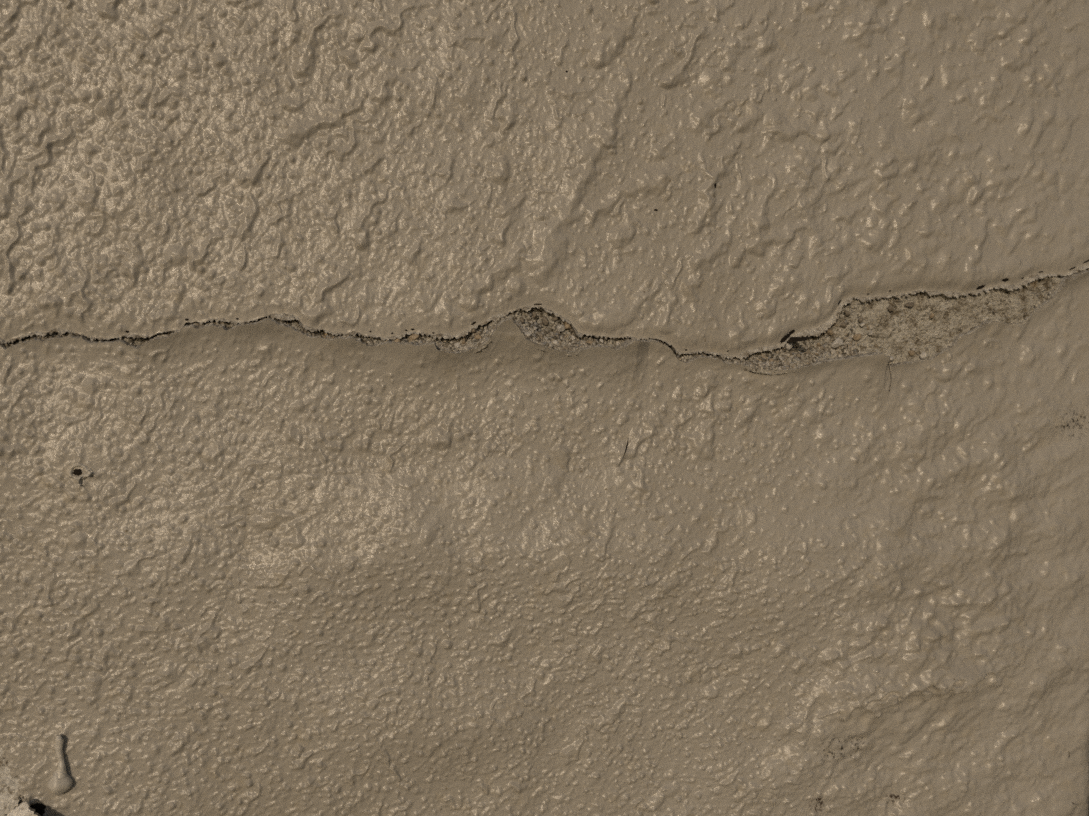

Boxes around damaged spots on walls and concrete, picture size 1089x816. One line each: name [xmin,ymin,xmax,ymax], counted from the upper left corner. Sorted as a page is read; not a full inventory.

crack [0,247,1089,457]
peeling [0,746,46,816]